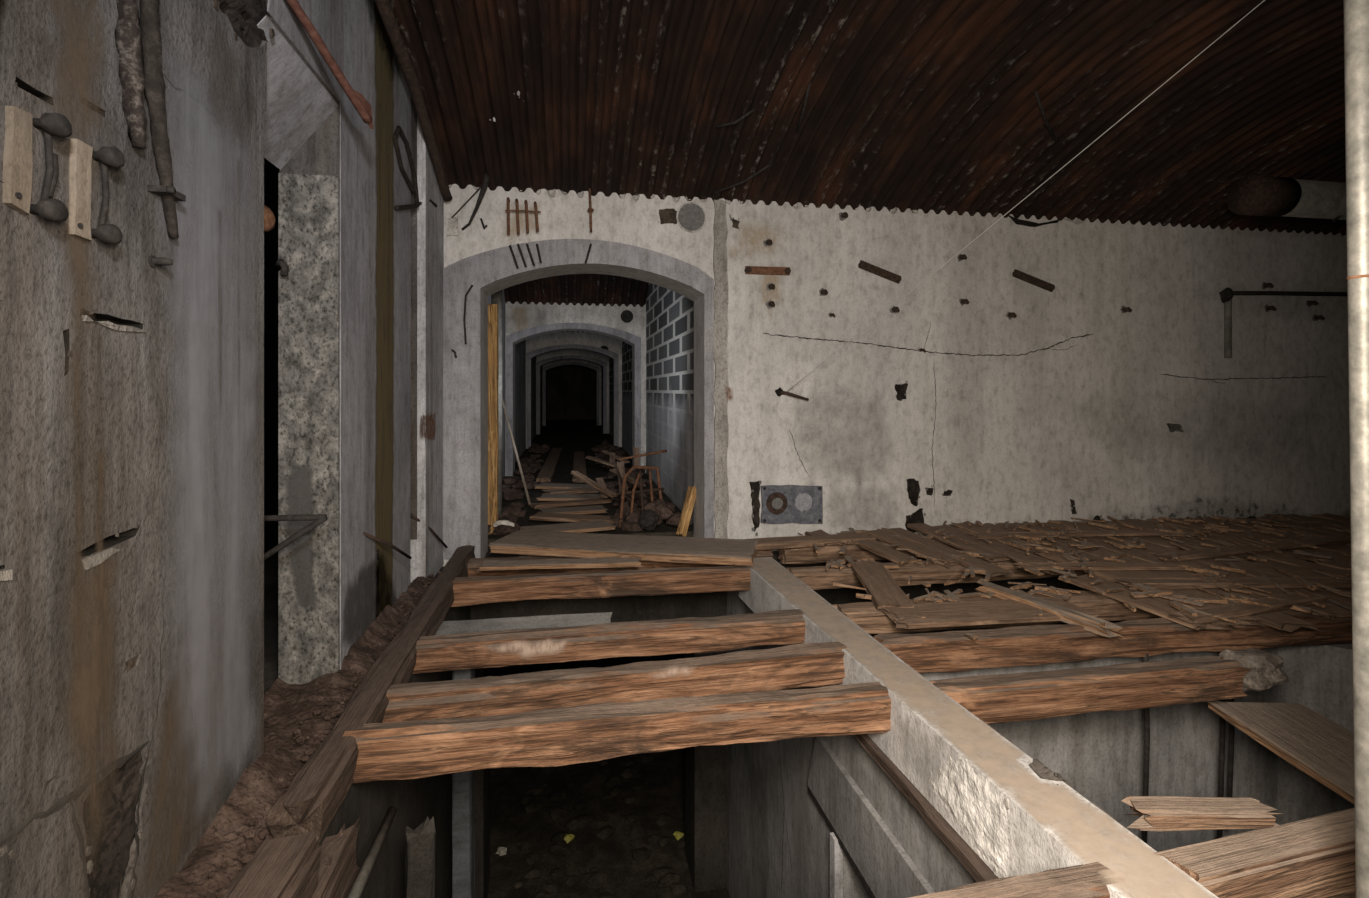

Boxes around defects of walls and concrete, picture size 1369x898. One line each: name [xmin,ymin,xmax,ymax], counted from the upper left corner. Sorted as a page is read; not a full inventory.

spalling [213,0,275,48]
spalling [905,478,952,533]
spalling [83,748,153,898]